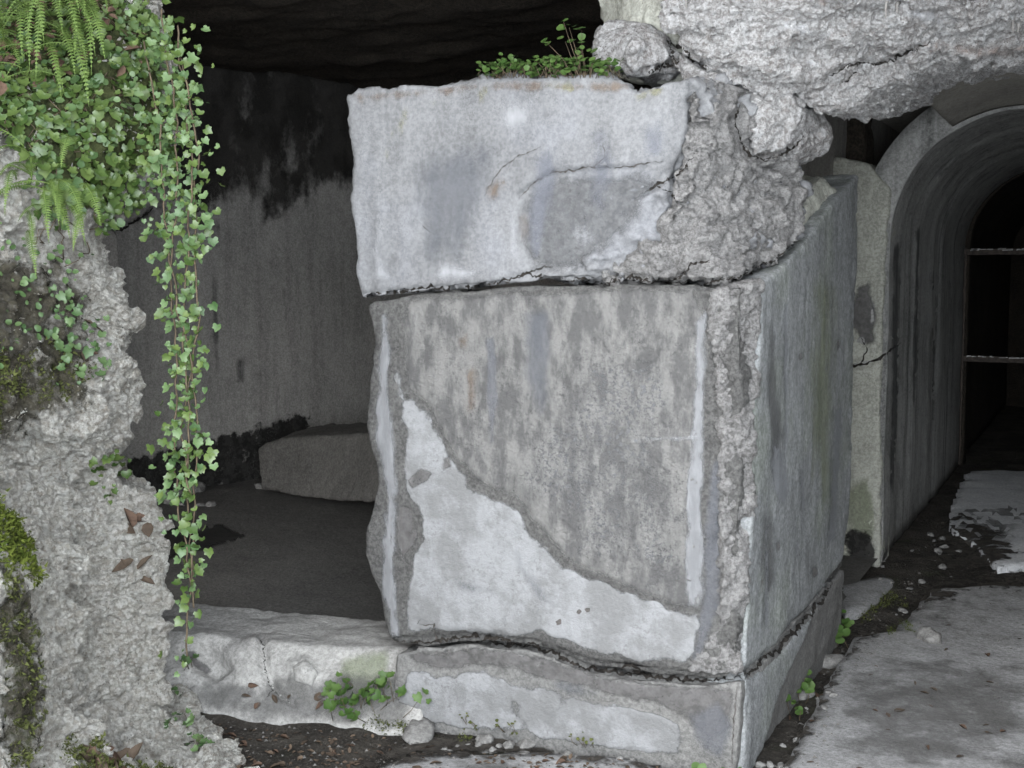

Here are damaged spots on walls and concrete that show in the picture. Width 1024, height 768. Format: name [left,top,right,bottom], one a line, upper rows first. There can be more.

crack [519,145,694,199]
flaking render [404,79,808,738]
crack [853,338,899,368]
crack [397,583,833,766]